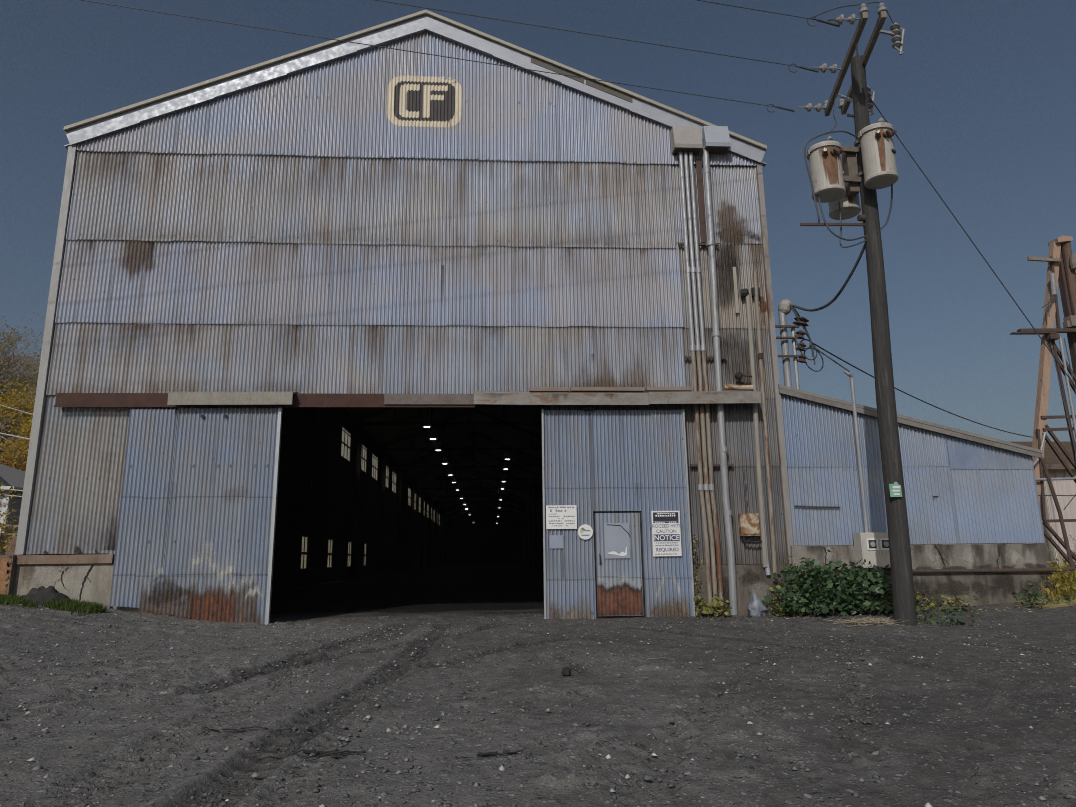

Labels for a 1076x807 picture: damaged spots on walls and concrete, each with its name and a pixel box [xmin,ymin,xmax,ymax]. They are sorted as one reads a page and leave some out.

corrosion [125,241,154,277]
crack [54,564,94,599]
corrosion [189,565,259,623]
corrosion [552,577,688,619]